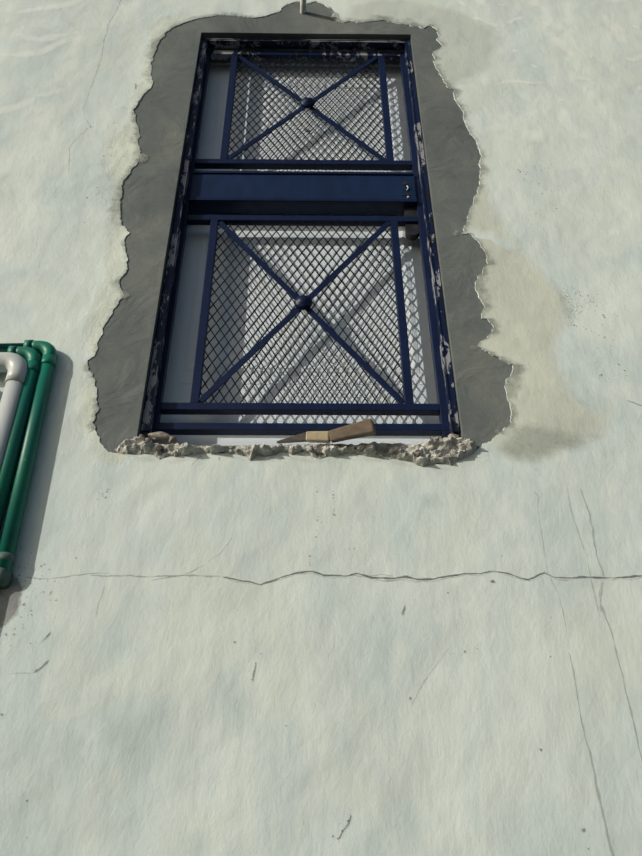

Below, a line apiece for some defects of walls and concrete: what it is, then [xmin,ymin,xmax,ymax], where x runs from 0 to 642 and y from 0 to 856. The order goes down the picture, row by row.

leakage [455,143,641,471]
leakage [74,373,139,468]
spalling [115,436,477,467]
crack [225,571,642,585]